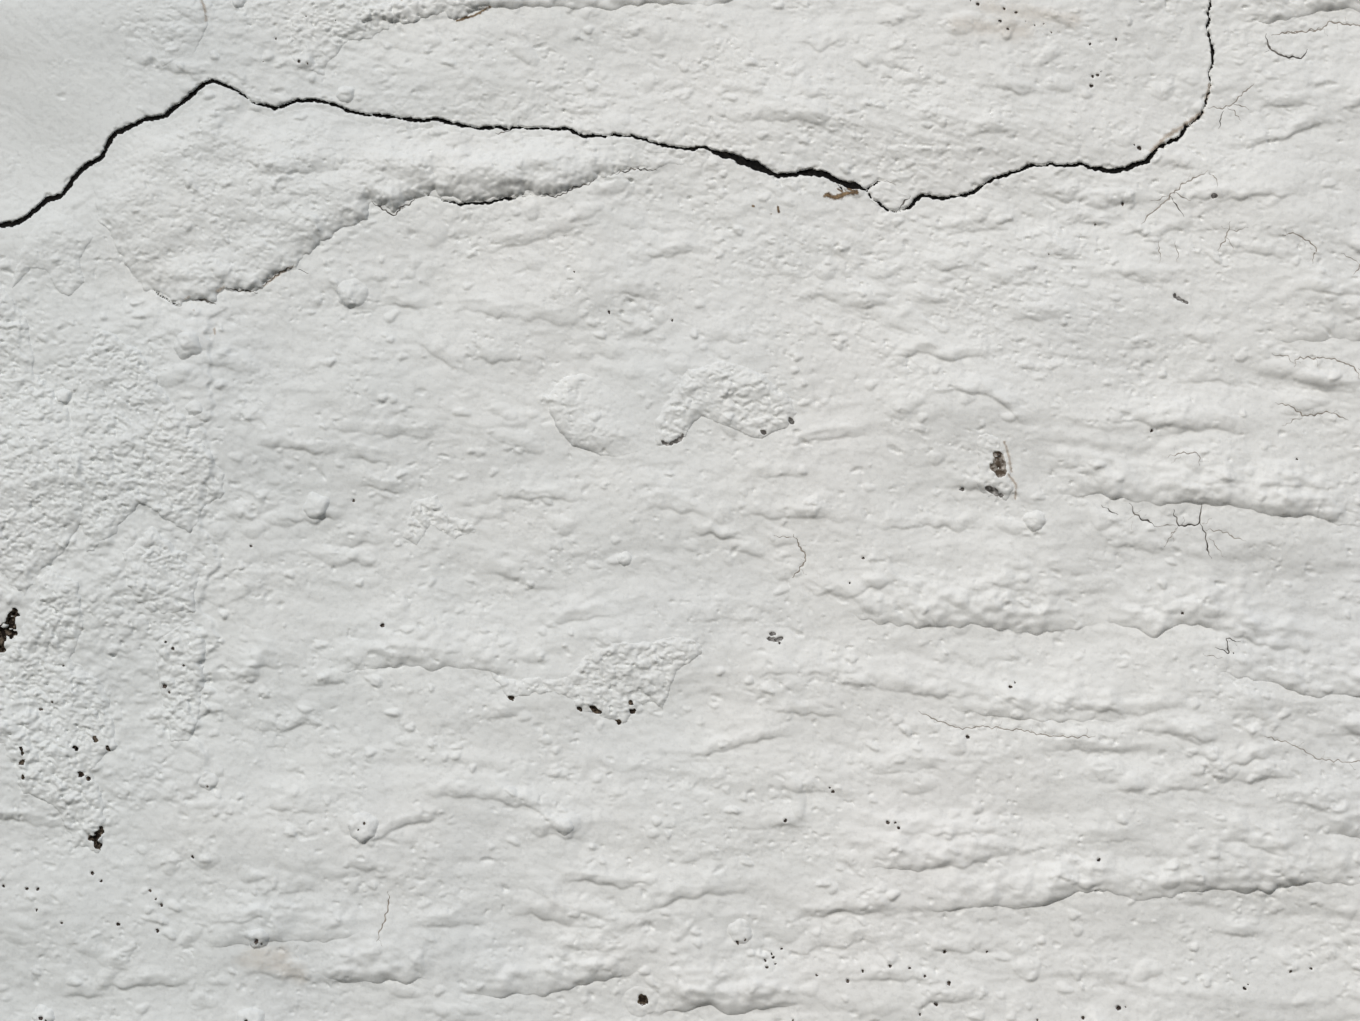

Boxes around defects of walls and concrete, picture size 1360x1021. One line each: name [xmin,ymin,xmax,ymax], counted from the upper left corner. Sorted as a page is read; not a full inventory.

crack [0,0,1254,228]
crack [1143,171,1218,260]
peeling [0,287,225,853]